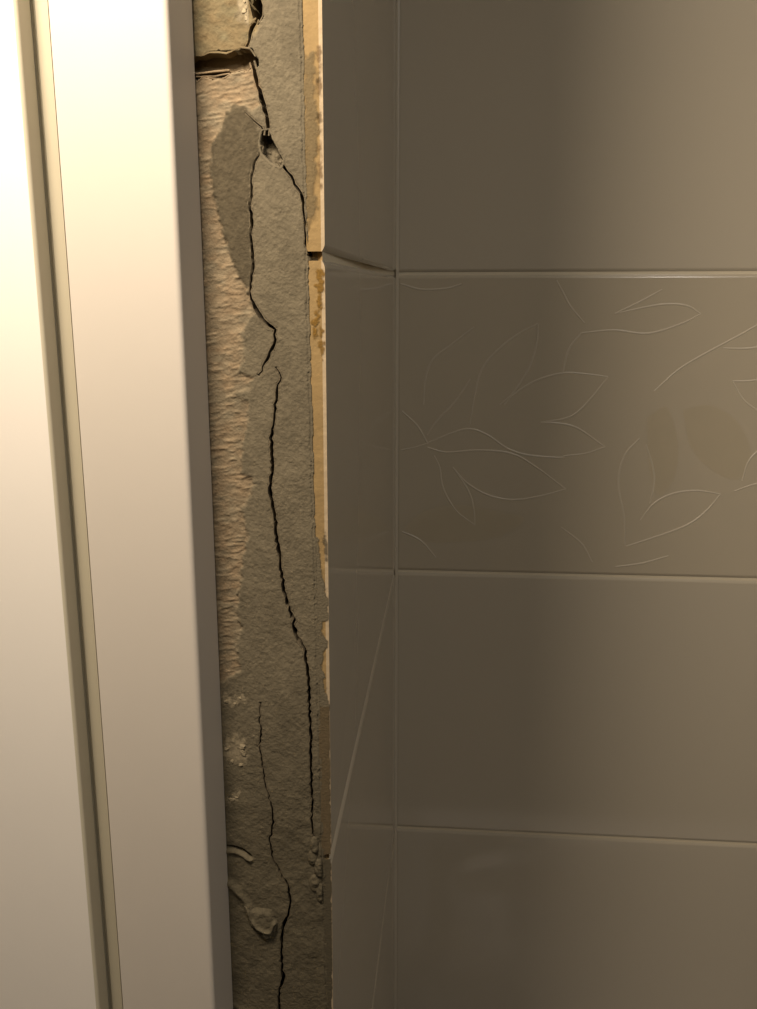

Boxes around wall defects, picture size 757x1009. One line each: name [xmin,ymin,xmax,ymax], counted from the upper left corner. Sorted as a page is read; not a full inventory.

spalling [238,0,249,23]
spalling [258,128,285,169]
crack [242,18,316,837]
peeling [223,732,251,766]
crack [256,702,293,1009]